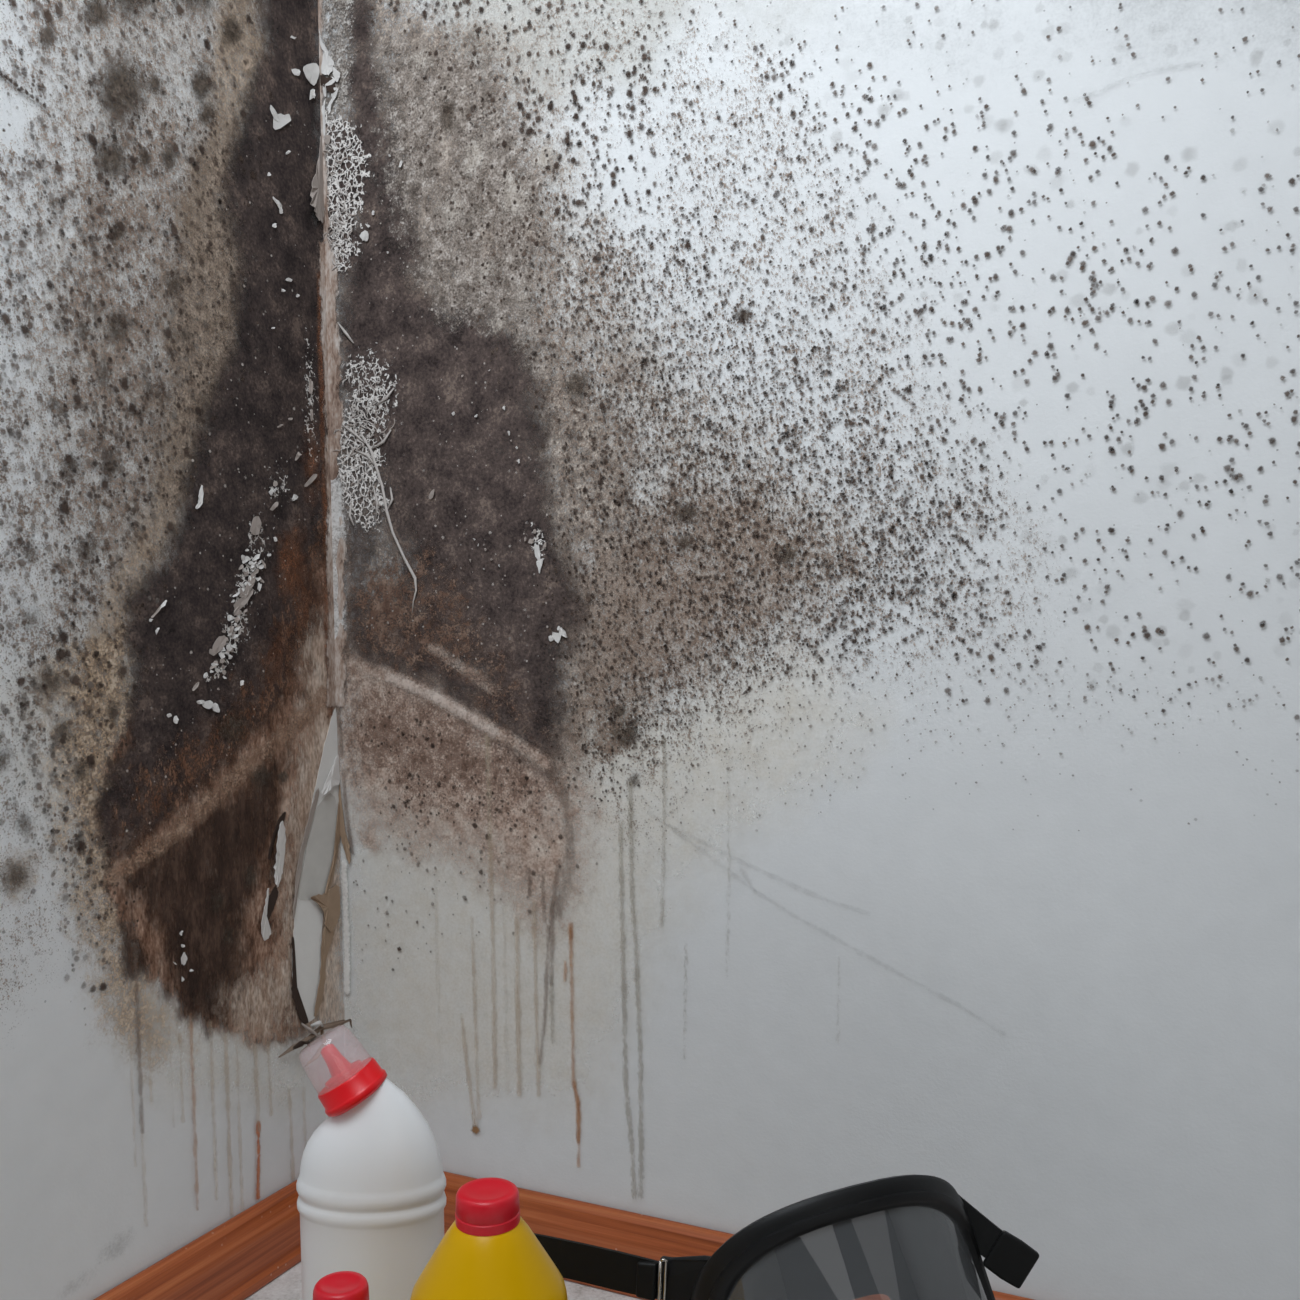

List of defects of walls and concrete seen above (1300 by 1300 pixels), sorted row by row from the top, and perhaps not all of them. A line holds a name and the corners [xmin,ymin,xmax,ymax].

damp [1212,265,1299,314]
damp [1258,173,1295,252]
damp [1189,312,1298,471]
peeling [192,0,353,1024]
damp [0,0,1251,1077]
damp [1226,558,1300,597]